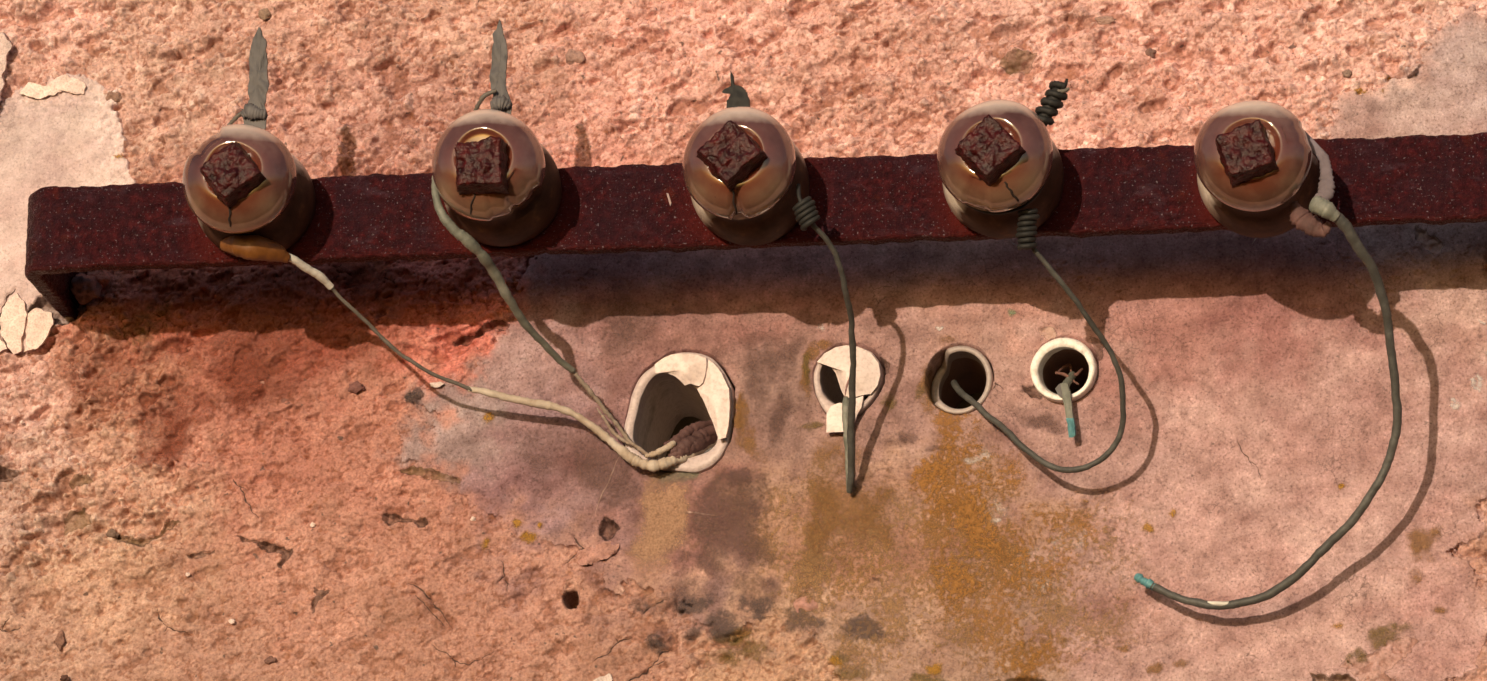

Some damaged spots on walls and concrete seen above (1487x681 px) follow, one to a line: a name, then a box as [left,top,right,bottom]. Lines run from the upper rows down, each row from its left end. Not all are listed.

flaking render [0,32,86,101]
spalling [999,47,1037,75]
flaking render [0,293,87,354]
spalling [453,320,510,346]
spalling [1022,386,1042,399]
leakage [1030,416,1056,427]
spalling [382,513,428,527]
leakage [632,470,763,566]
flaking render [563,517,620,597]
leakage [677,583,825,640]
leakage [846,616,883,641]
flaking render [1310,636,1419,681]